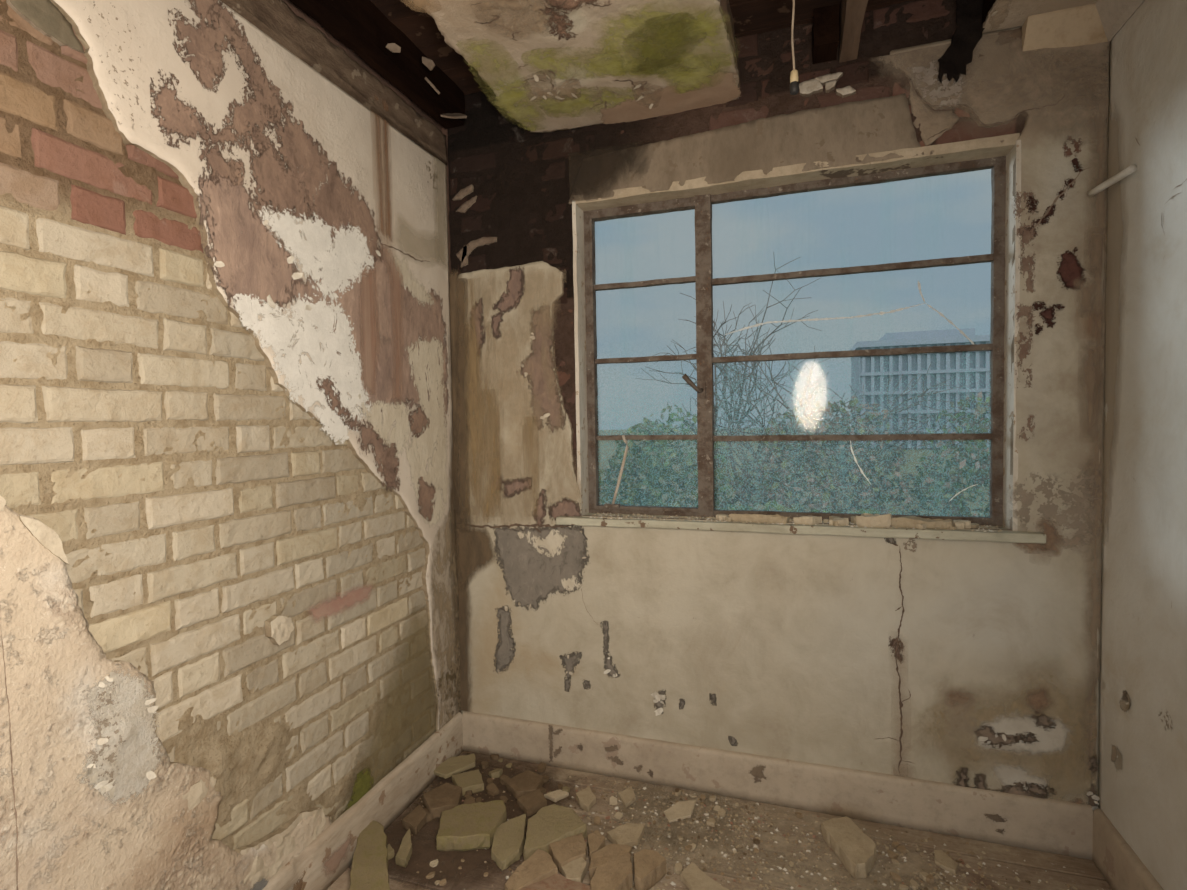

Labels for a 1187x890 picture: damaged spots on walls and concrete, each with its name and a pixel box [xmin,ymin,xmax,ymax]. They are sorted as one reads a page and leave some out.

crack [472,0,647,110]
peeling [1063,136,1083,172]
flaking render [448,0,1026,477]
peeling [1013,192,1065,388]
peeling [1056,247,1086,290]
flaking render [0,0,450,889]
peeling [490,474,590,674]
peeling [559,651,591,692]
peeling [600,621,620,678]
crack [877,542,912,775]
peeling [952,767,1057,799]
peeling [974,712,1057,749]